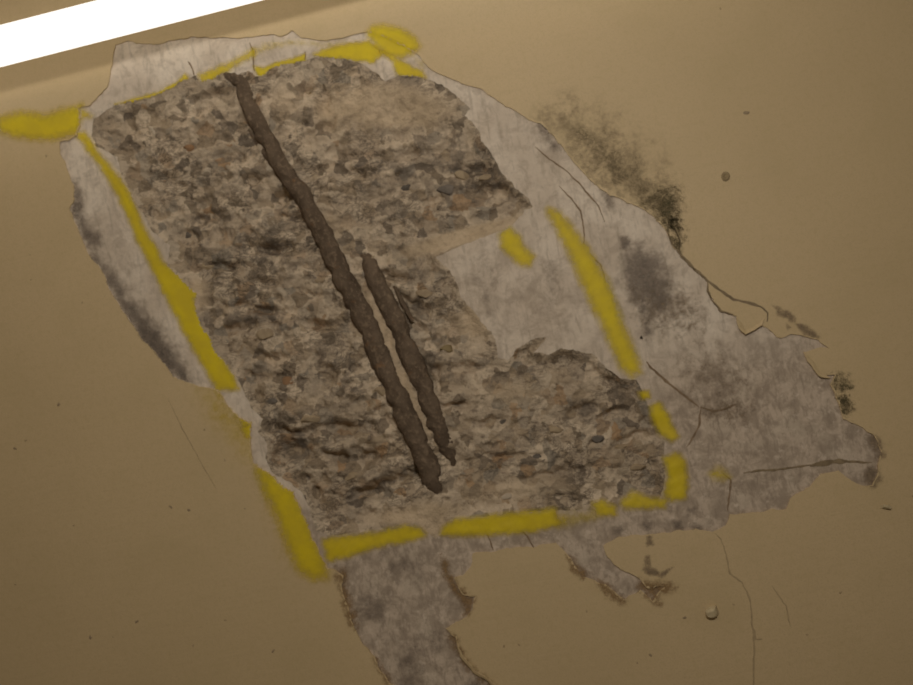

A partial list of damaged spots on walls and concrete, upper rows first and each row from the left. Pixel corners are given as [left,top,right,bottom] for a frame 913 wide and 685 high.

damp [642,186,683,250]
spalling [60,31,668,685]
peeling [436,76,881,533]
crack [723,458,872,511]
crack [712,531,762,685]